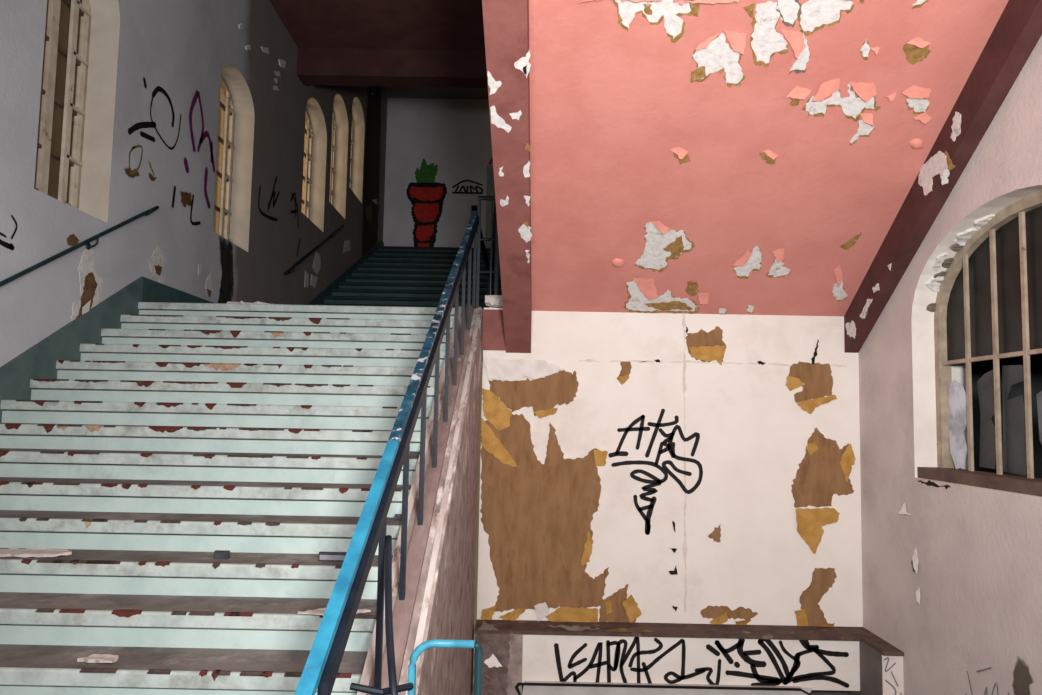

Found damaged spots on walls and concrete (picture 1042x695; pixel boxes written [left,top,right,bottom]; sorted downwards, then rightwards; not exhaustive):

peeling [487,71,522,133]
peeling [514,52,531,78]
peeling [613,0,932,146]
peeling [623,221,727,365]
peeling [159,316,350,352]
peeling [33,362,282,388]
peeling [786,340,837,414]
peeling [149,426,320,434]
peeling [791,427,856,554]
peeling [472,357,653,695]
peeling [795,568,837,627]
peeling [199,669,303,681]